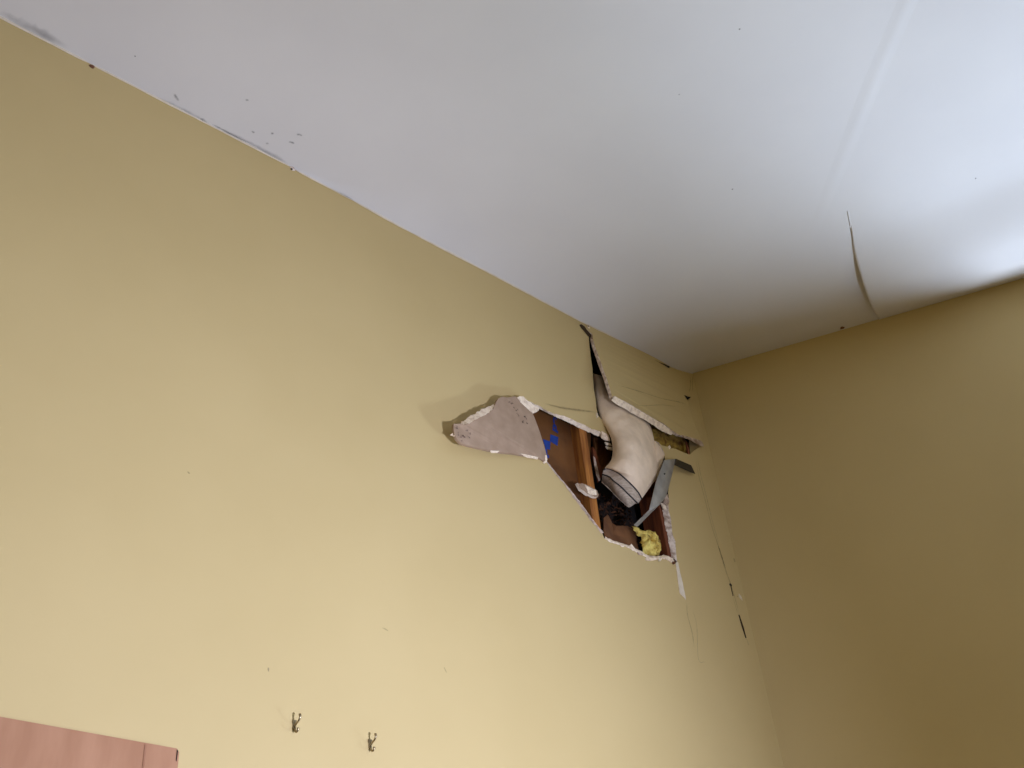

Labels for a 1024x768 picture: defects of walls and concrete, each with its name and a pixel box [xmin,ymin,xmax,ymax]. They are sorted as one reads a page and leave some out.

peeling [517,396,539,413]
peeling [601,431,613,450]